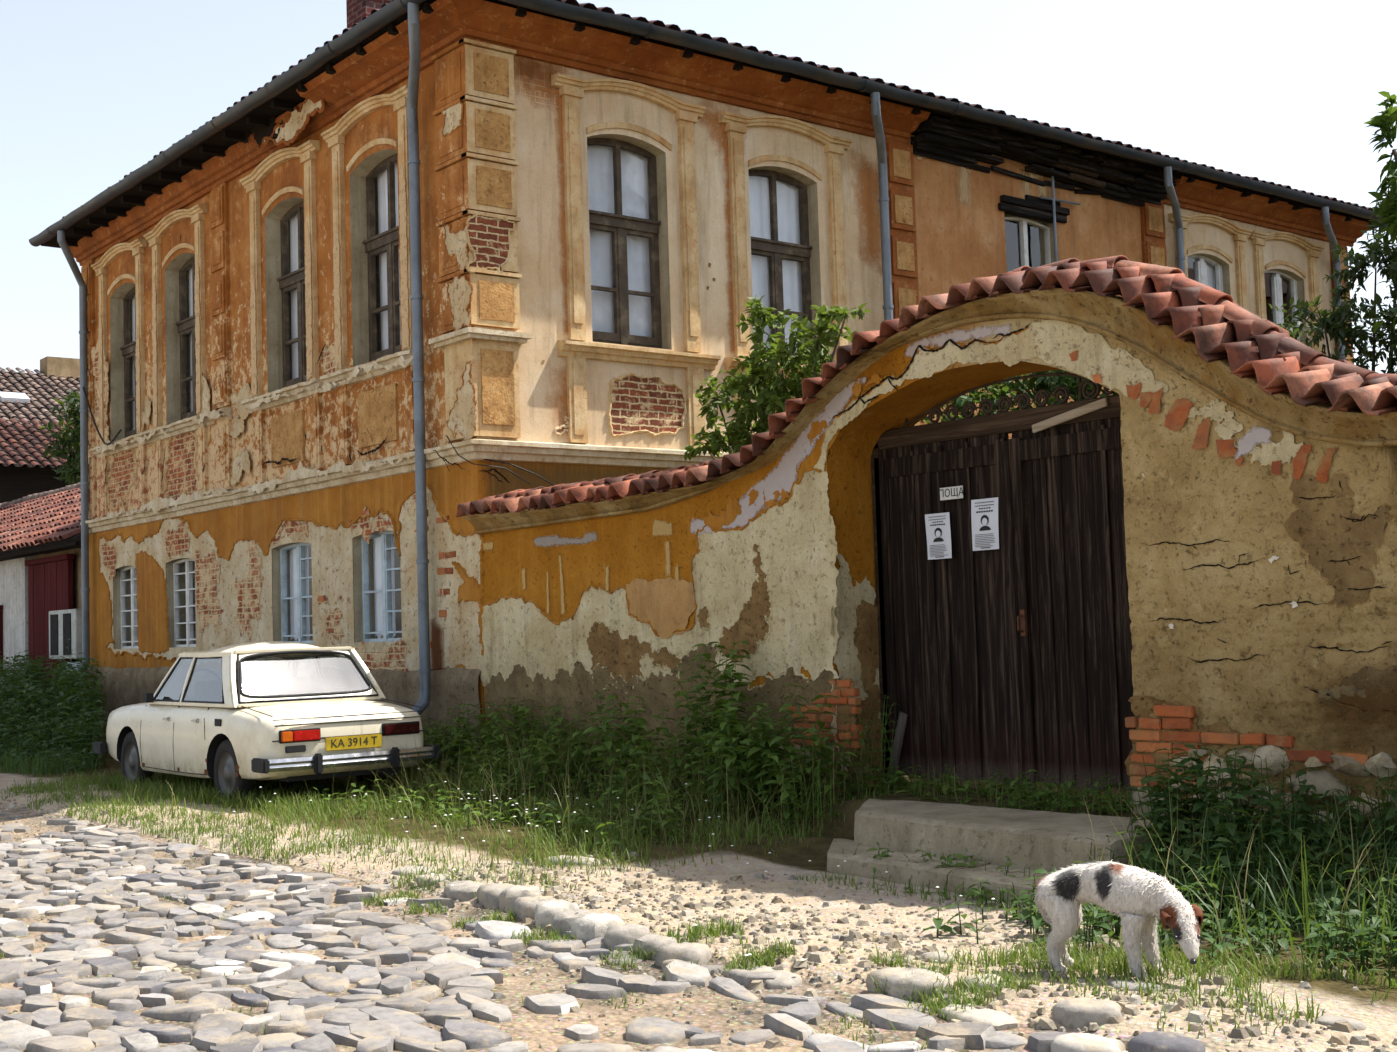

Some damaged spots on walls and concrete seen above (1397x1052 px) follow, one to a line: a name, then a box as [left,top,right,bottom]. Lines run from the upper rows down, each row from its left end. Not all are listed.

flaking render [91,275,157,511]
flaking render [194,254,210,414]
flaking render [230,274,257,486]
flaking render [444,213,515,331]
flaking render [97,319,1395,788]
crack [1147,617,1265,663]
crack [1140,539,1388,609]
crack [1298,481,1378,522]